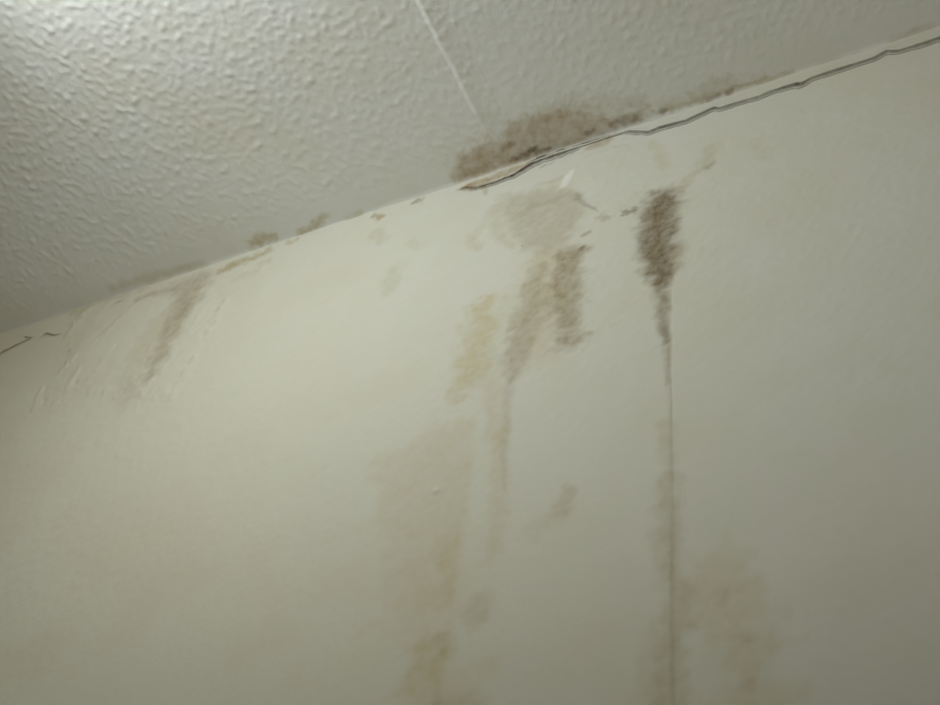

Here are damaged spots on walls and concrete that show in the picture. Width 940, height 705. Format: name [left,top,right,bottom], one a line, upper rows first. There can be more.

crack [456,37,940,190]
crack [0,332,62,354]
damp [65,208,393,418]
damp [349,138,725,705]